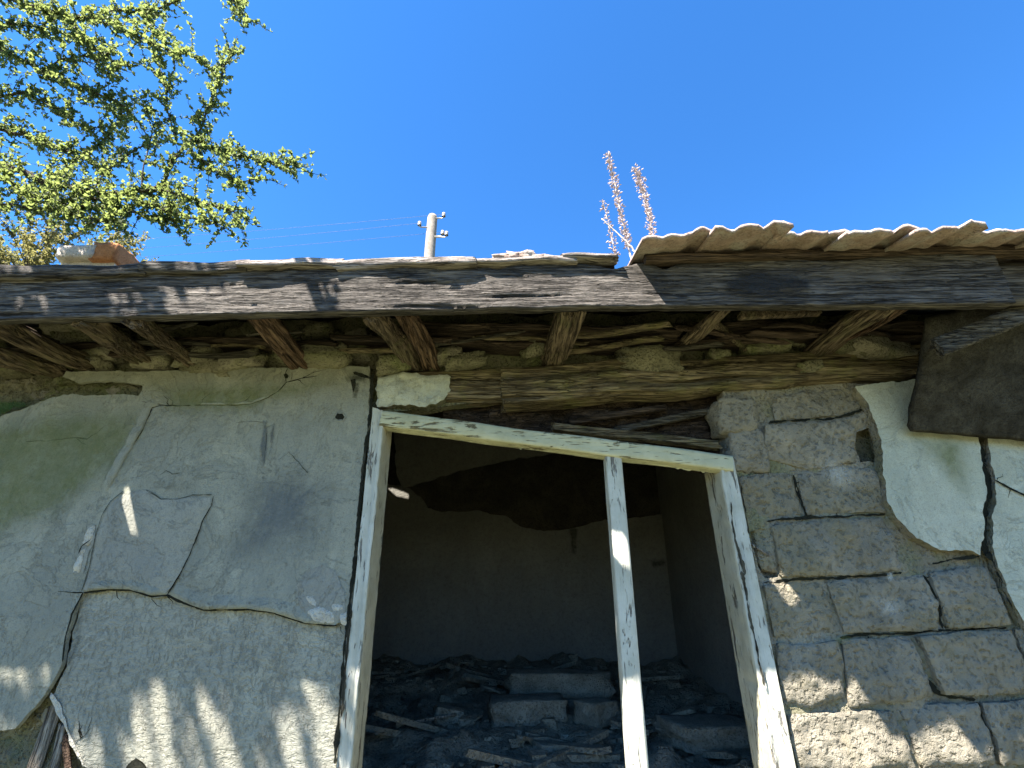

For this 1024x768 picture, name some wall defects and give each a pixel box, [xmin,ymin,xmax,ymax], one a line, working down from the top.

crack [58,368,374,764]
spalling [855,431,875,463]
crack [932,446,1024,609]